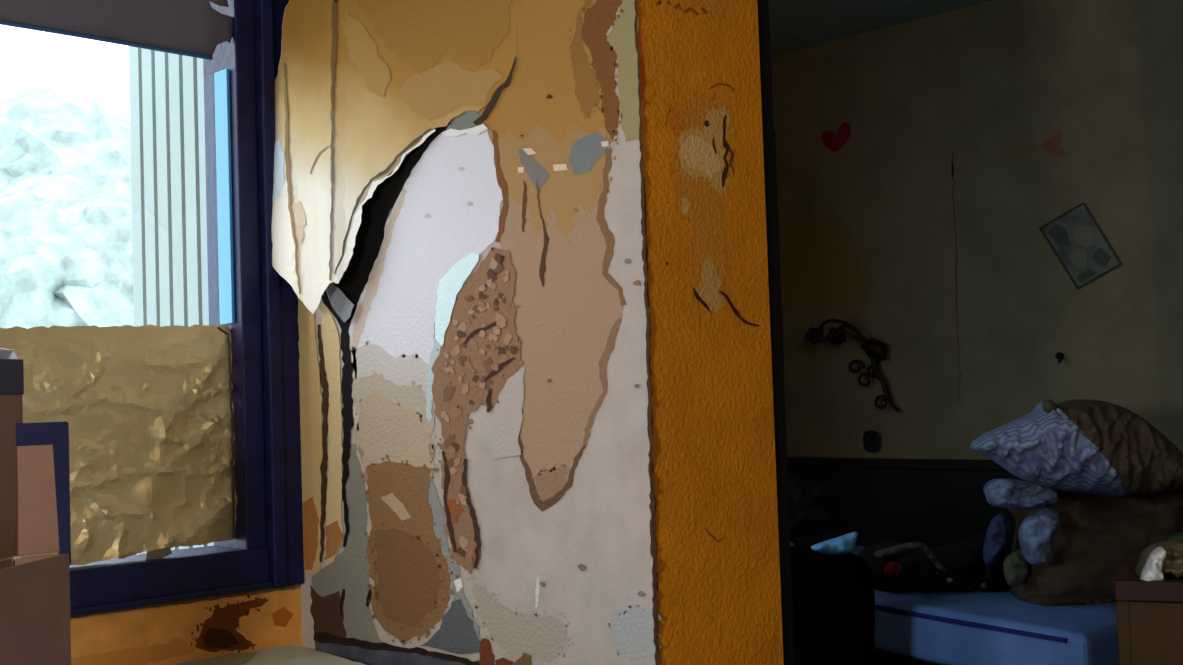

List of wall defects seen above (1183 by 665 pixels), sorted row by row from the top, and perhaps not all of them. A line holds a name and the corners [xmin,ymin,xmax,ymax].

peeling [517,132,609,190]
crack [709,83,735,187]
spalling [634,0,666,665]
crack [693,288,759,326]
peeling [297,110,525,665]
rust [191,593,293,655]